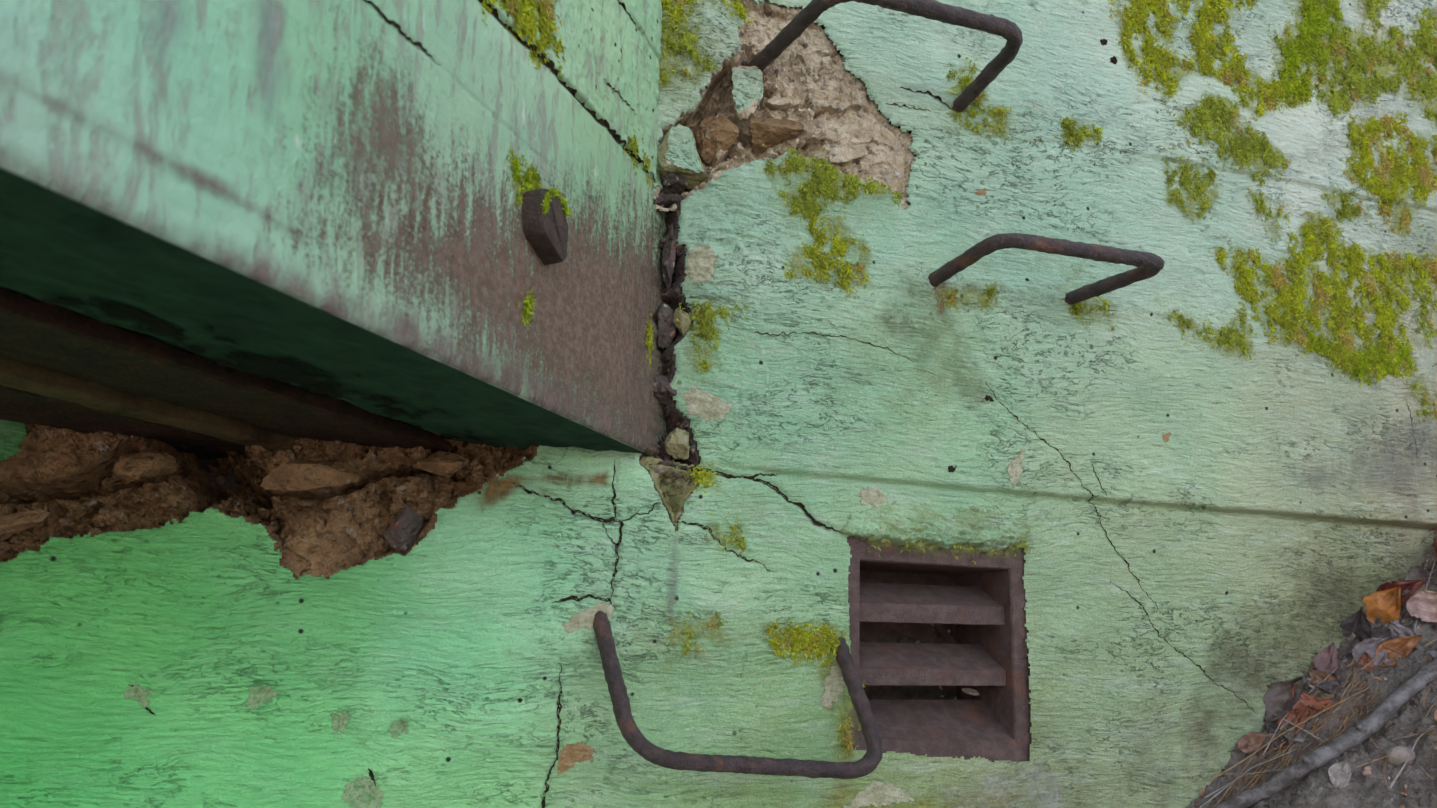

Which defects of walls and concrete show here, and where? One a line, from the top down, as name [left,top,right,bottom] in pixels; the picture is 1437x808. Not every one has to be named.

rust [224,40,668,456]
spalling [639,0,916,531]
spalling [0,424,539,580]
crack [515,463,770,608]
crack [676,465,841,533]
crack [985,381,1257,714]
crack [541,662,562,808]